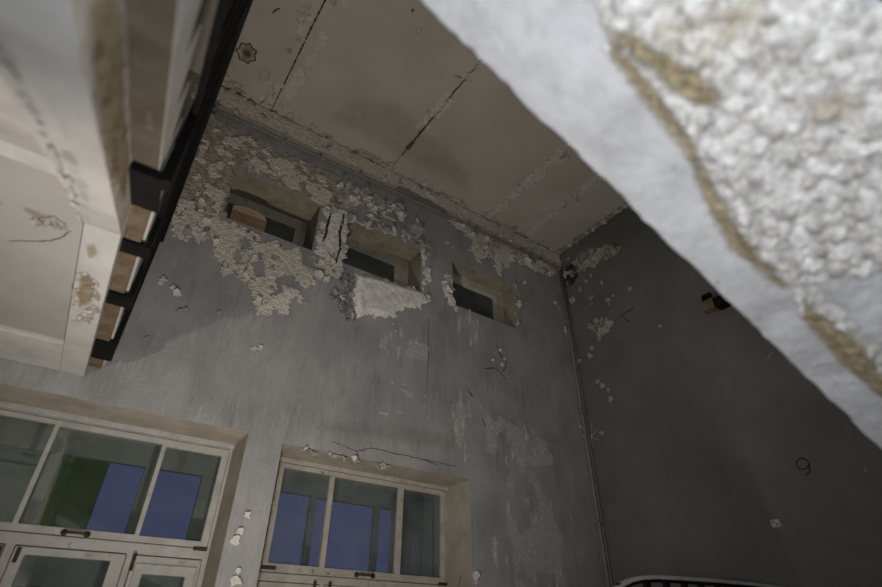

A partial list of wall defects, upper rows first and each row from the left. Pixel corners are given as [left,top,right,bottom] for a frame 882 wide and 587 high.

crack [259,0,326,110]
crack [383,59,481,167]
peeling [170,73,629,326]
flaking render [595,0,882,375]
flaking render [71,271,101,324]
peeling [578,317,614,362]
crack [332,441,457,467]
peeling [230,511,251,546]
peeling [230,568,242,587]